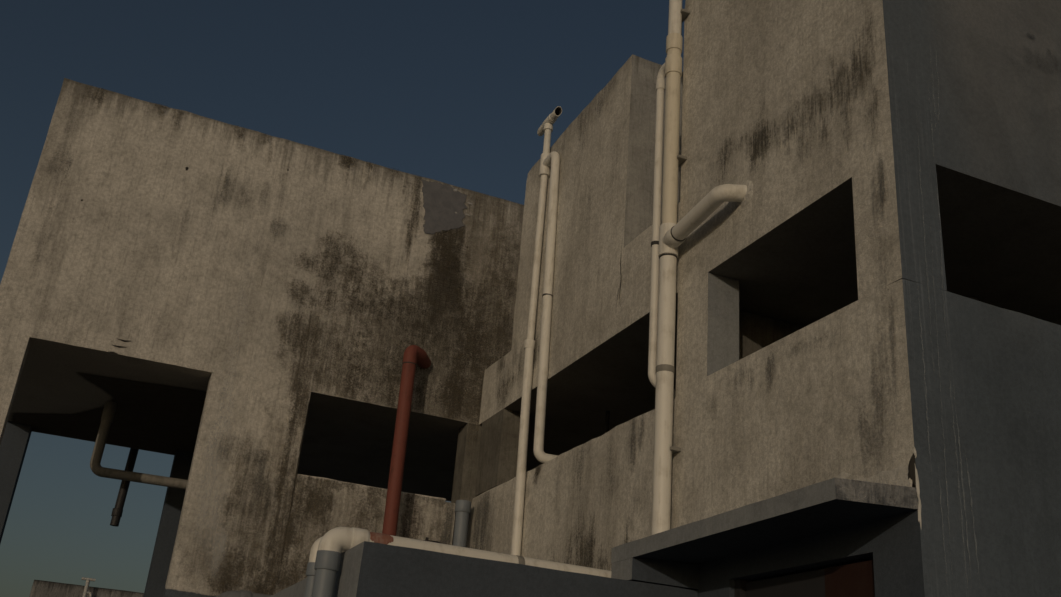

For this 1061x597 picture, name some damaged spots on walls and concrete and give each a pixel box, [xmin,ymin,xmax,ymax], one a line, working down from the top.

damp [212,316,355,595]
damp [291,228,537,423]